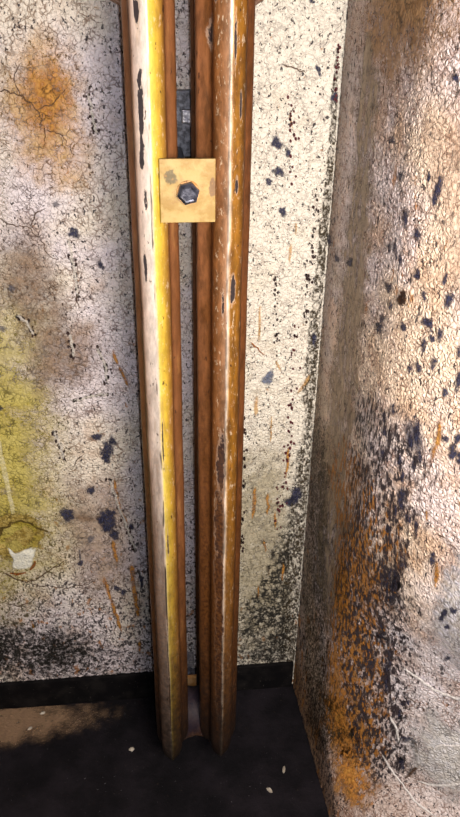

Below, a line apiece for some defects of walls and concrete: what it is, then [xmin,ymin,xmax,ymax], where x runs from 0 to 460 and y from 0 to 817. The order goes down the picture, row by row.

crack [0,63,74,155]
damp [427,172,443,207]
damp [442,273,454,309]
damp [420,317,443,353]
damp [0,327,47,566]
damp [443,434,460,463]
flaking render [0,514,50,576]
damp [439,607,458,629]
damp [0,627,125,679]
corrosion [324,527,382,808]